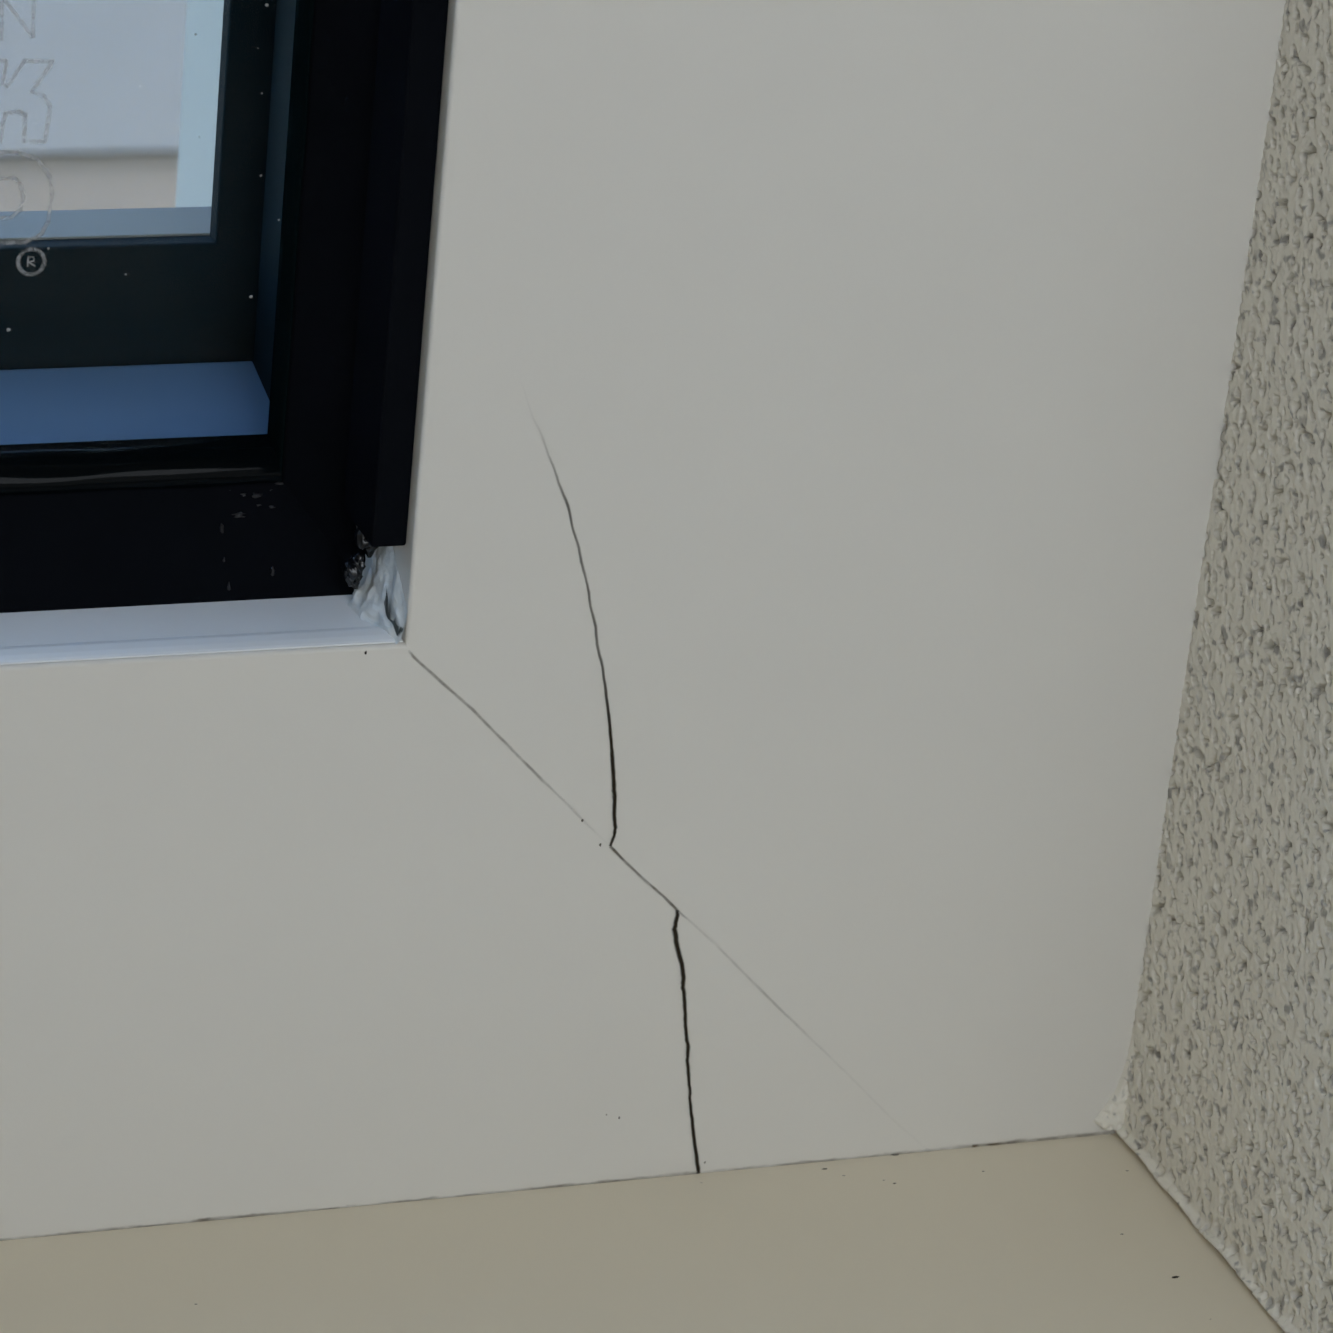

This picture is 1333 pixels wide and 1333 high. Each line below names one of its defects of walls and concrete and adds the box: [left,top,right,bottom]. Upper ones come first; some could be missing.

crack [580,556,700,1174]